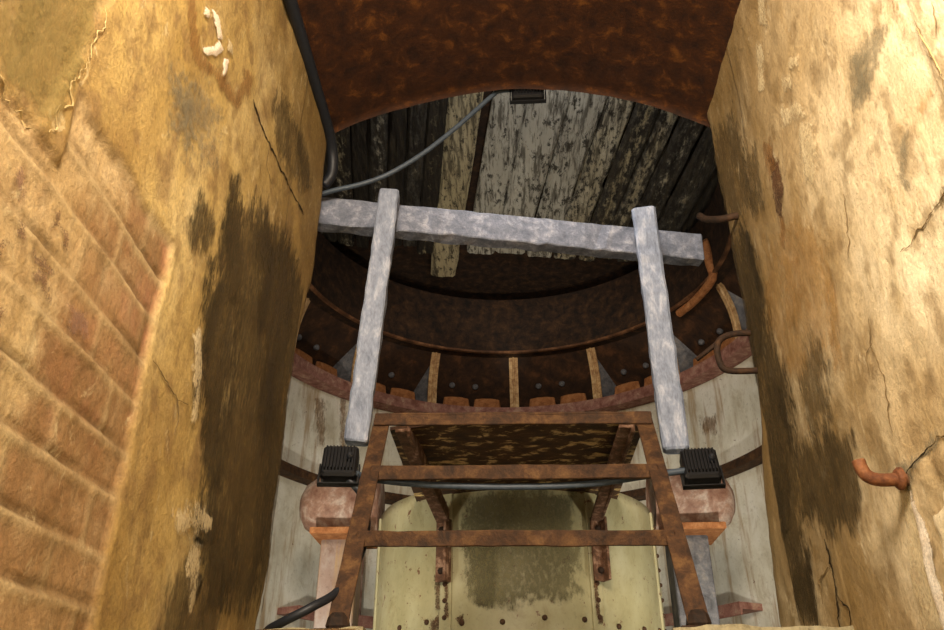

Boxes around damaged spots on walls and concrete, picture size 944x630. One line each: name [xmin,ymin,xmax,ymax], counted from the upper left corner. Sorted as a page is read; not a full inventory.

peeling [203,7,233,77]
water stain [756,44,765,92]
crack [915,3,944,88]
crack [900,193,944,252]
water stain [158,174,303,630]
water stain [713,101,861,626]
crack [906,435,944,473]
water stain [899,437,944,630]